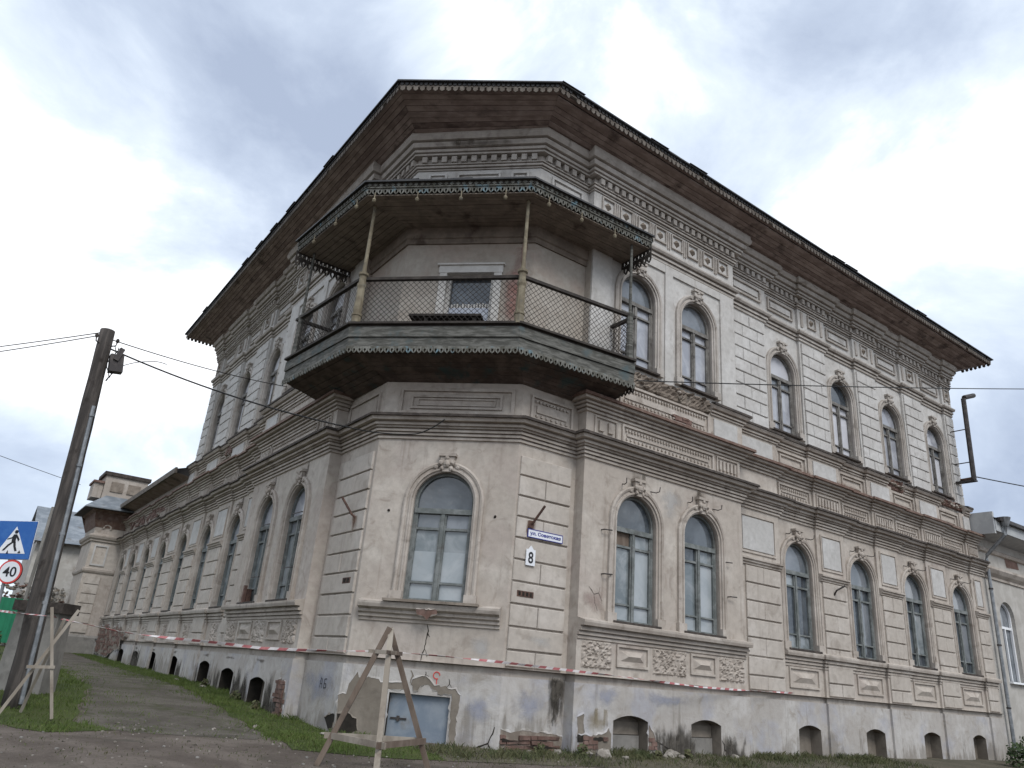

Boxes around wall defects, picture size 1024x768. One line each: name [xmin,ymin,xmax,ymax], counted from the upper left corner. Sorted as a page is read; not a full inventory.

crack [410,625,451,688]
flaking render [271,677,286,717]
flaking render [328,671,460,745]
water stain [550,679,564,720]
flaking render [498,712,611,754]